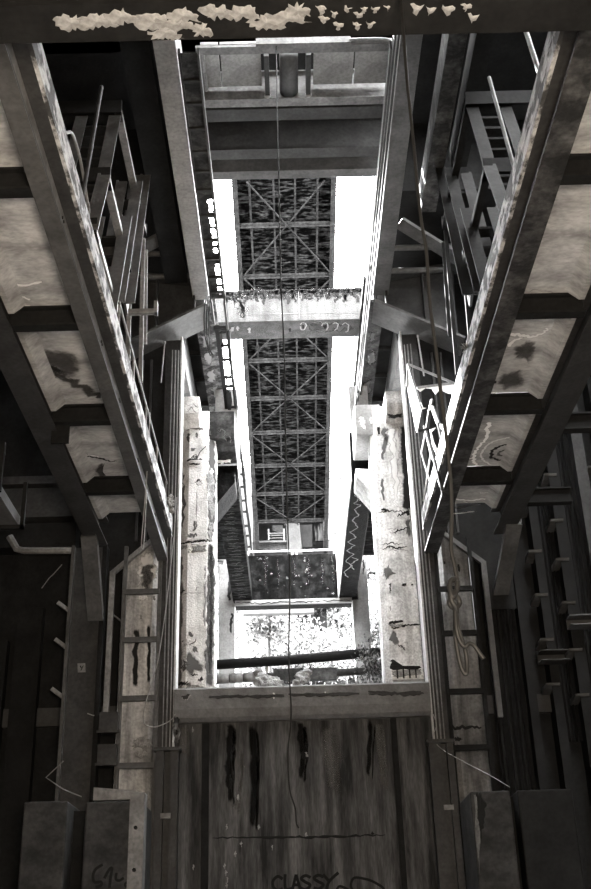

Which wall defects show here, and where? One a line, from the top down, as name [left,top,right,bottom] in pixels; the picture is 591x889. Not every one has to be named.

peeling [53,2,390,41]
peeling [411,3,479,23]
leakage [508,328,549,361]
leakage [45,351,101,398]
leakage [491,370,523,393]
crack [378,508,408,551]
leakage [132,626,151,686]
leakage [224,725,236,804]
leakage [249,727,260,830]
leakage [297,723,308,781]